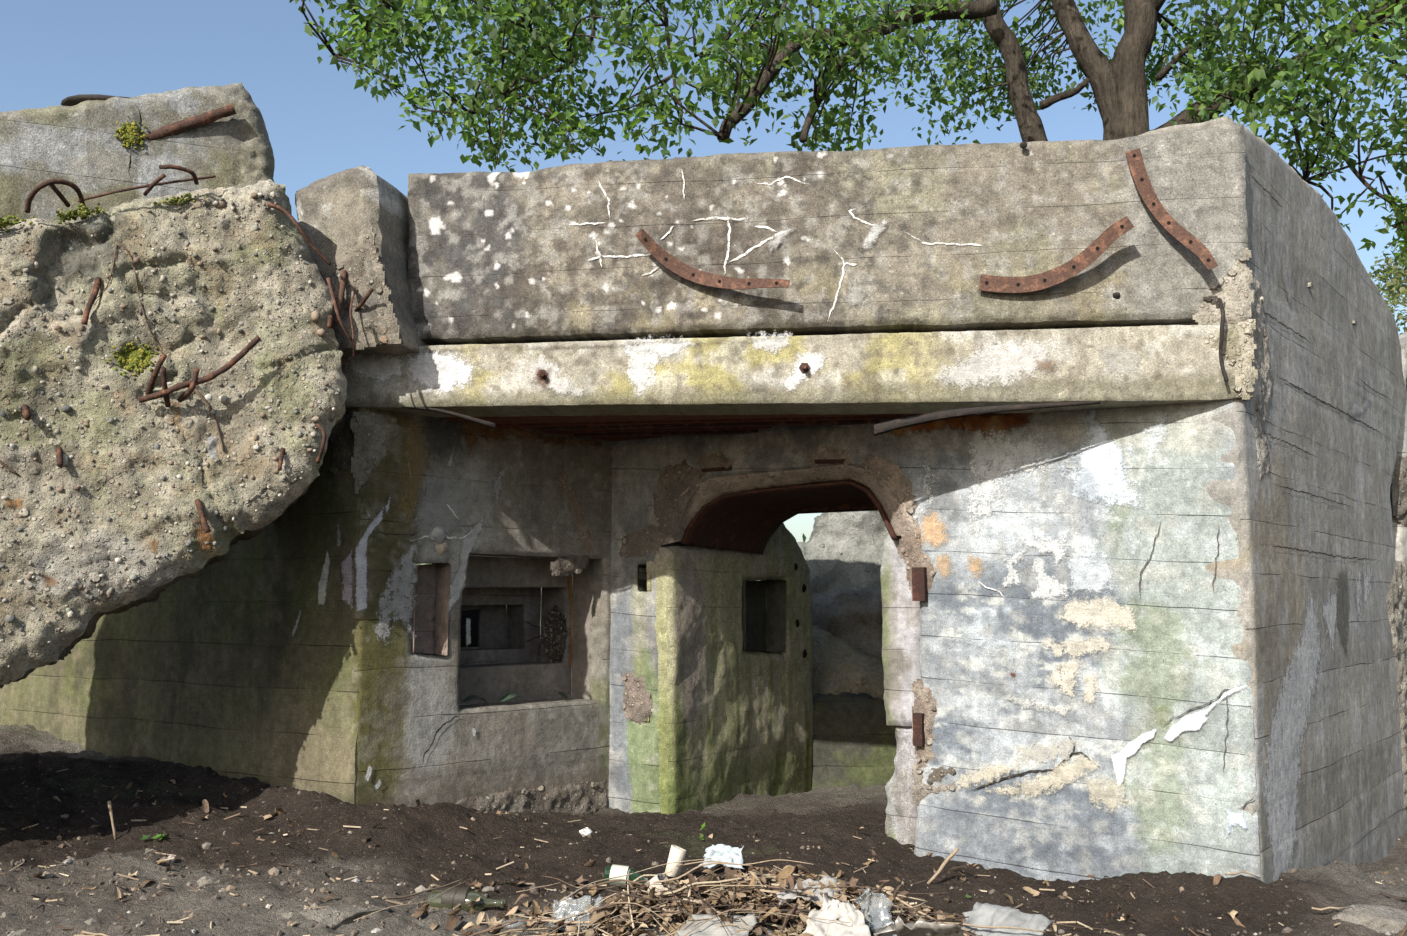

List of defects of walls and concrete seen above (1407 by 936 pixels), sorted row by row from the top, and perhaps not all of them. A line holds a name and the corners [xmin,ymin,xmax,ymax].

crack [755,176,810,185]
crack [569,172,792,276]
crack [849,209,985,247]
crack [829,250,857,317]
spalling [1193,248,1274,480]
corrosion [889,413,1045,437]
spalling [1391,456,1407,527]
spalling [1386,558,1407,809]
crack [966,737,1099,792]